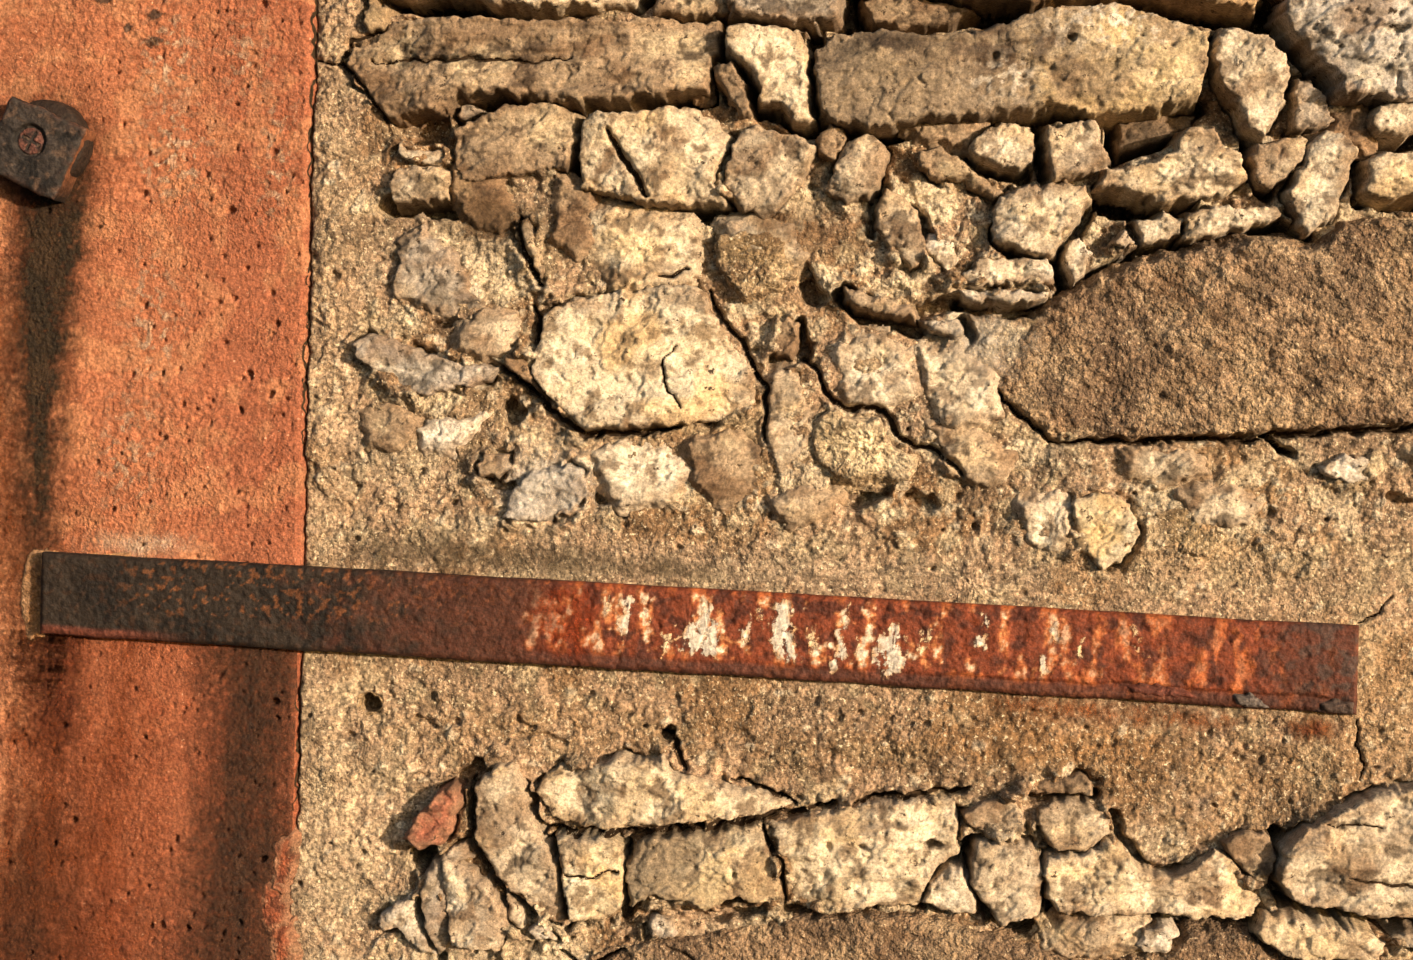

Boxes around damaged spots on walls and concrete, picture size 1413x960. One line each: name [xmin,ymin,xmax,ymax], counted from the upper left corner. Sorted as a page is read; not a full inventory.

rust [1126,682,1197,721]
rust [1226,692,1269,719]
rust [1291,698,1354,737]
leakage [180,644,298,960]
spalling [260,825,304,960]
crack [562,948,625,960]